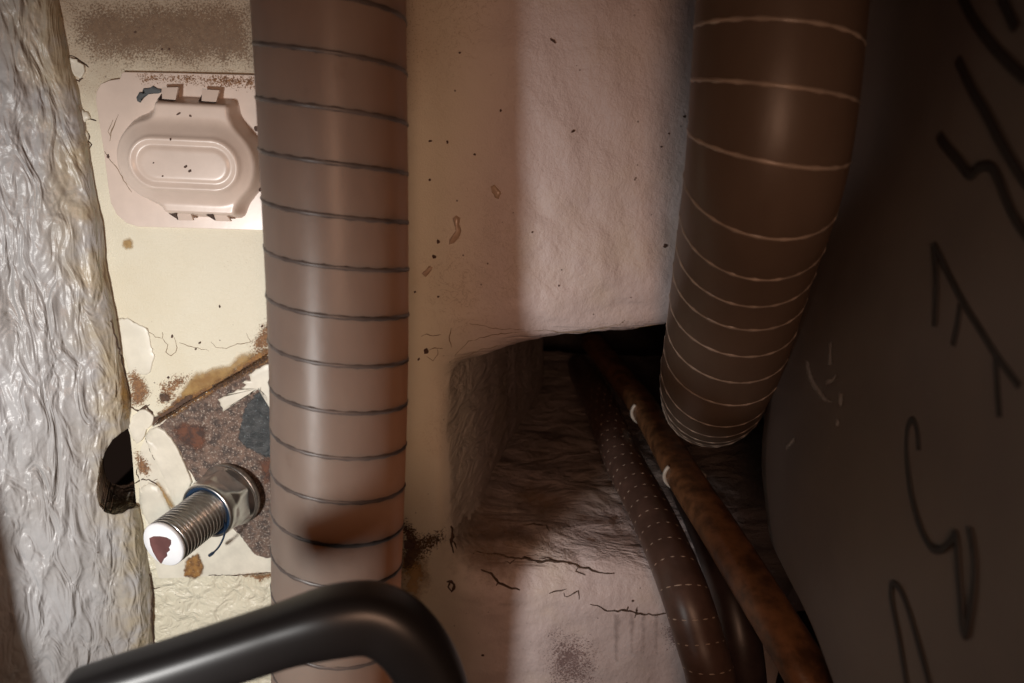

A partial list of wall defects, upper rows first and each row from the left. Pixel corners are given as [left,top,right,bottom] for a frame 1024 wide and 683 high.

crack [110,318,263,488]
corrosion [120,318,268,426]
spalling [129,362,271,558]
crack [449,526,666,618]